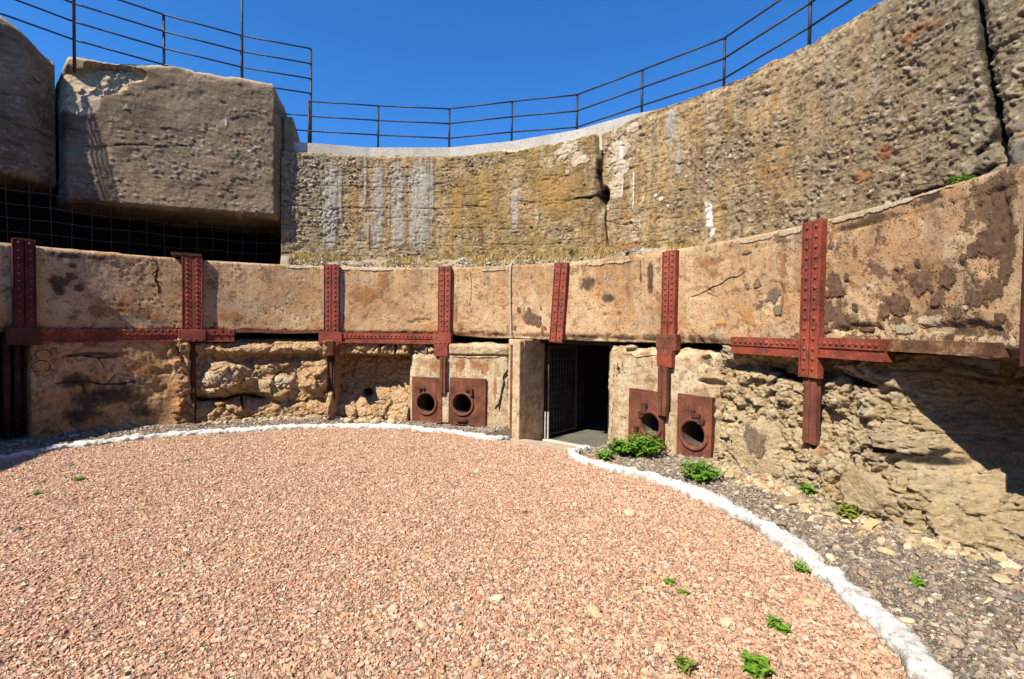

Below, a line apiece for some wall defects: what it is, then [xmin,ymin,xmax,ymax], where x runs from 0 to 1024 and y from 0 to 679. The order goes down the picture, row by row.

crack [917,0,1013,195]
leakage [321,155,434,251]
crack [564,154,635,244]
crack [689,274,742,298]